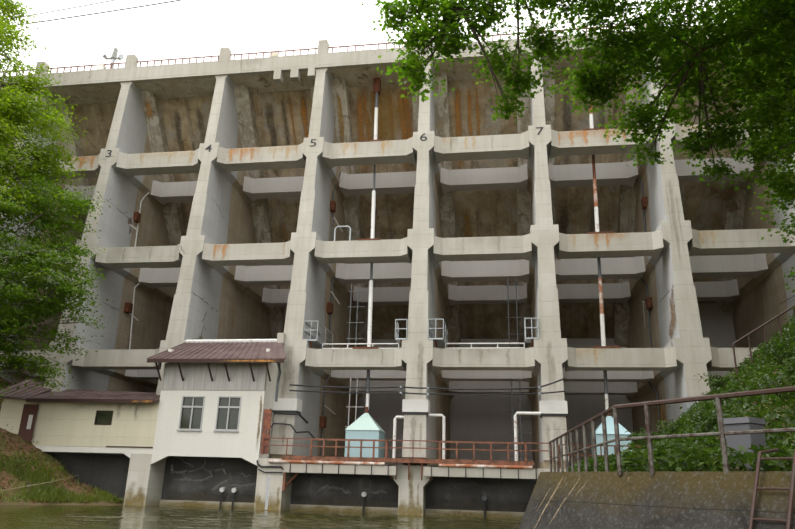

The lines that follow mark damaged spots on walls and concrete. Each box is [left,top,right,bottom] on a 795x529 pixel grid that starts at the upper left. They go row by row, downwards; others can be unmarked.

water stain [282,99,309,142]
water stain [357,93,419,142]
water stain [455,90,500,137]